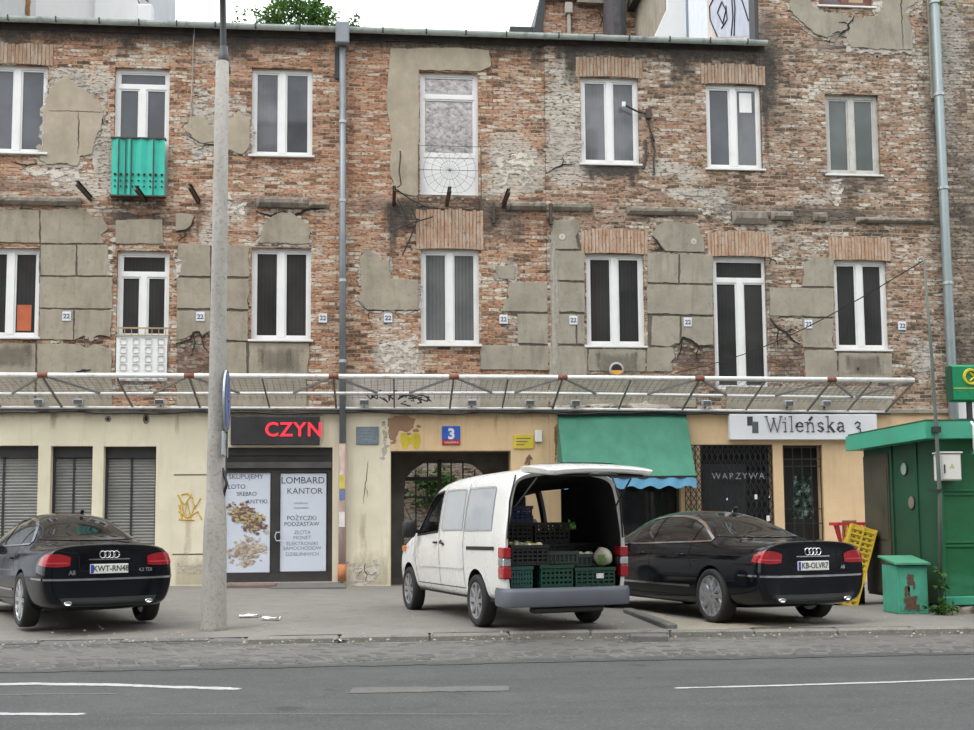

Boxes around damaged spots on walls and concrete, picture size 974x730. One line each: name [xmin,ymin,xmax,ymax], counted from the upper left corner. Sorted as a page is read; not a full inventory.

crack [833,15,855,37]
flaking render [769,0,926,60]
flaking render [22,64,115,186]
flaking render [180,84,215,165]
flaking render [228,92,256,156]
flaking render [419,122,584,210]
flaking render [255,209,316,248]
flaking render [355,246,423,316]
crack [175,331,210,356]
crack [673,336,714,363]
crack [769,318,801,346]